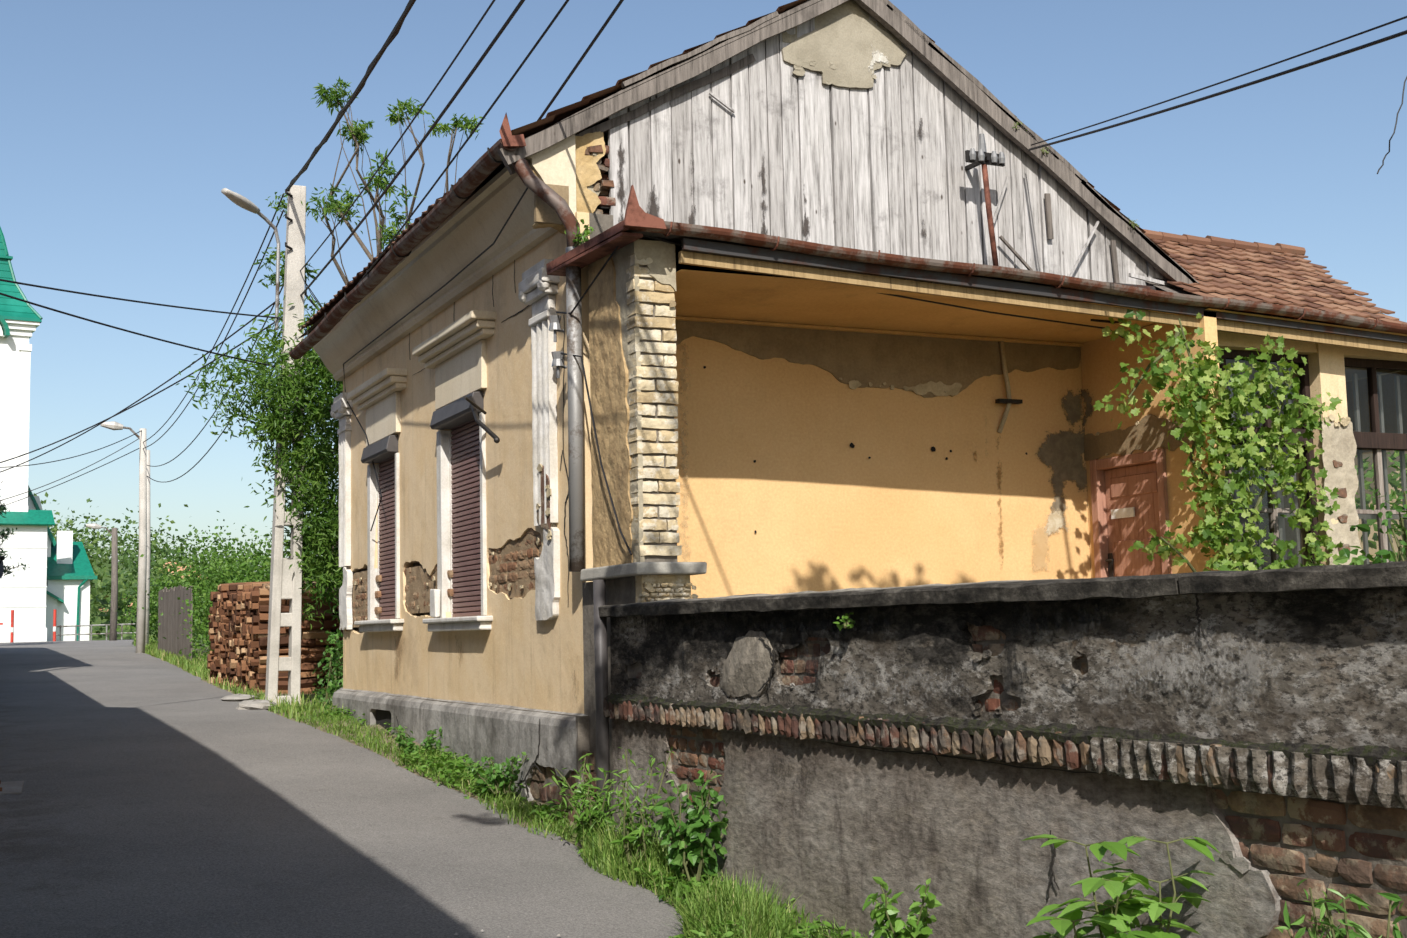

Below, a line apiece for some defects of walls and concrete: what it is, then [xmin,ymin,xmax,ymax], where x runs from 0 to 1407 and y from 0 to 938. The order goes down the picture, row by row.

peeling [781,13,907,89]
spalling [575,133,616,215]
peeling [673,320,1081,398]
peeling [1084,414,1193,461]
spalling [1321,414,1362,565]
flaking render [488,464,552,598]
flaking render [352,571,383,627]
flaking render [404,565,454,614]